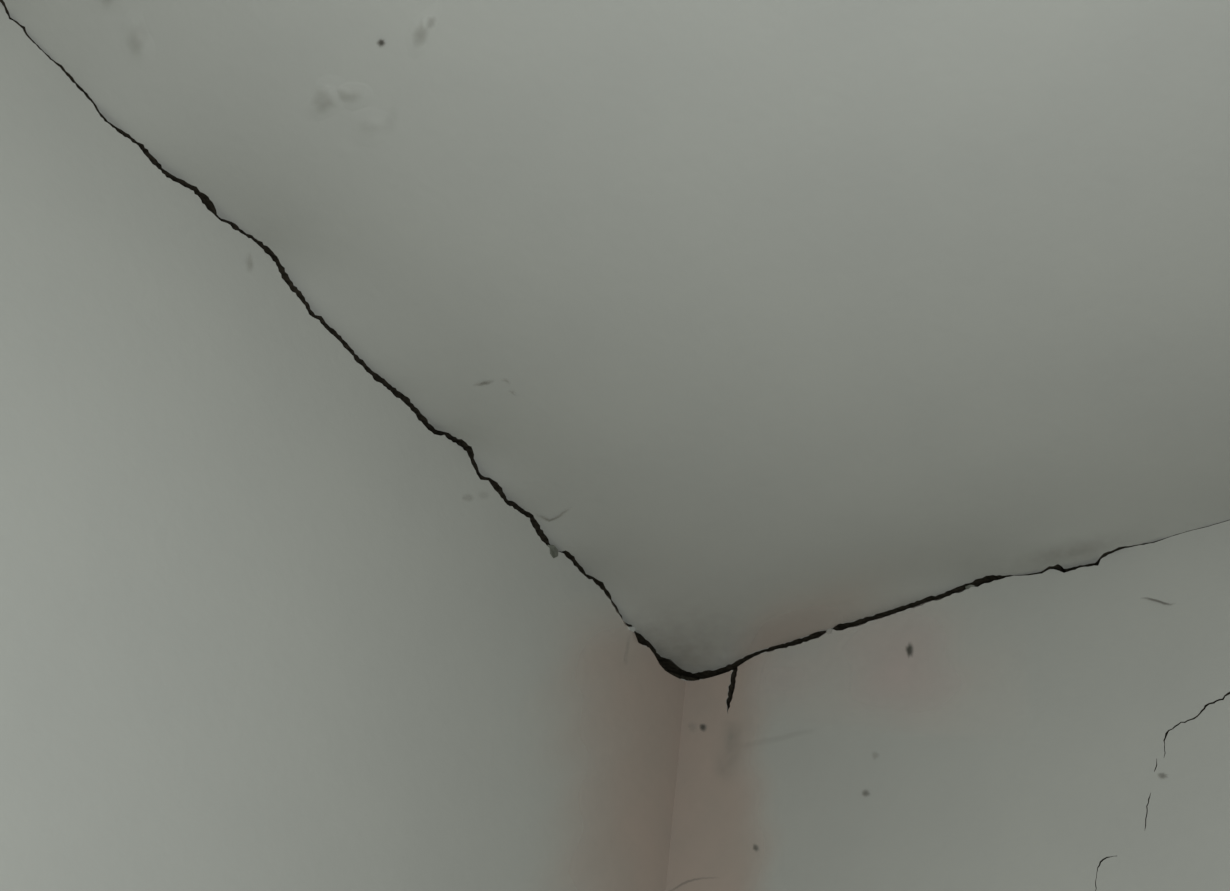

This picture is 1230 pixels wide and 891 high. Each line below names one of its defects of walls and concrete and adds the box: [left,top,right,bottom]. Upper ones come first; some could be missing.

crack [0,0,1229,712]
crack [1145,692,1230,828]